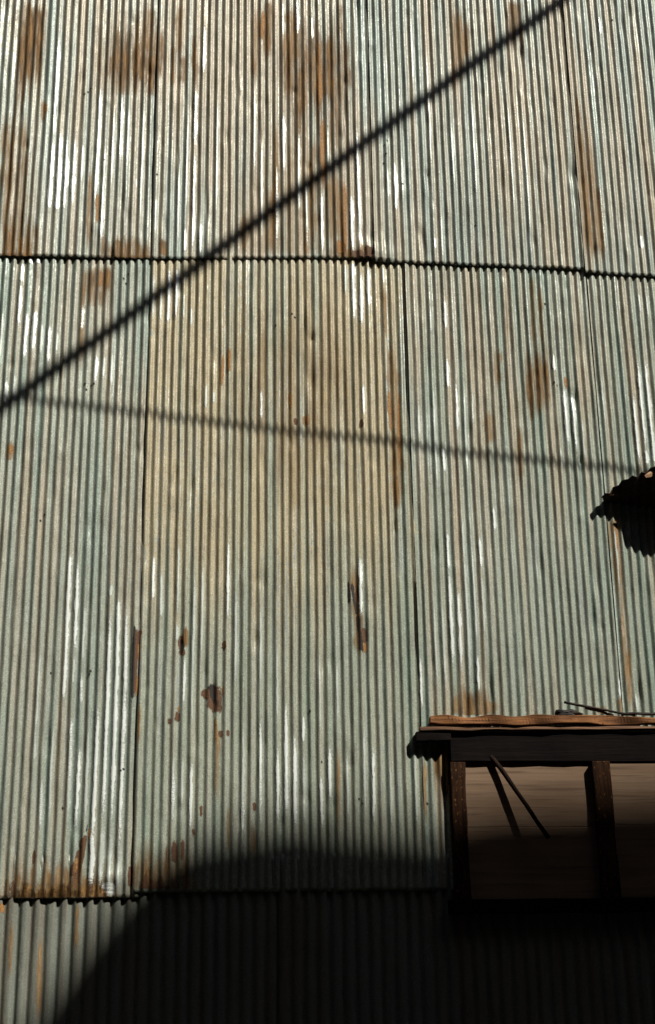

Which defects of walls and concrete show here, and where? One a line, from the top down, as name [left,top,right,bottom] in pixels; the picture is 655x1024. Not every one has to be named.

rust [175,625,188,653]
rust [201,684,230,763]
rust [7,829,106,942]